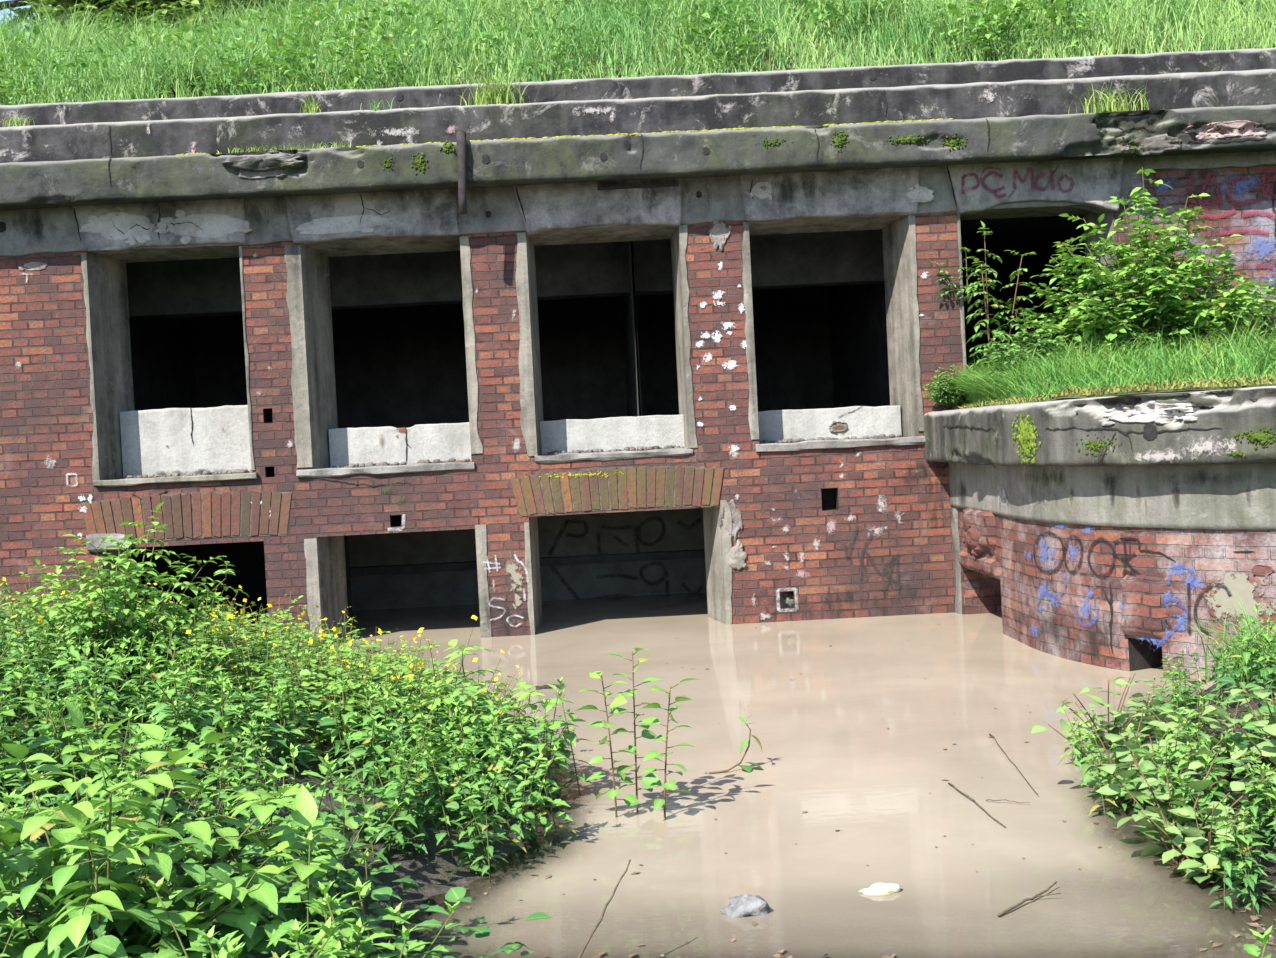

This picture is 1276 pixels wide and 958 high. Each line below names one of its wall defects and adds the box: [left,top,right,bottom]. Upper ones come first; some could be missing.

spalling [1120,120,1267,156]
crack [113,205,202,240]
spalling [1101,400,1200,426]
spalling [718,499,747,570]